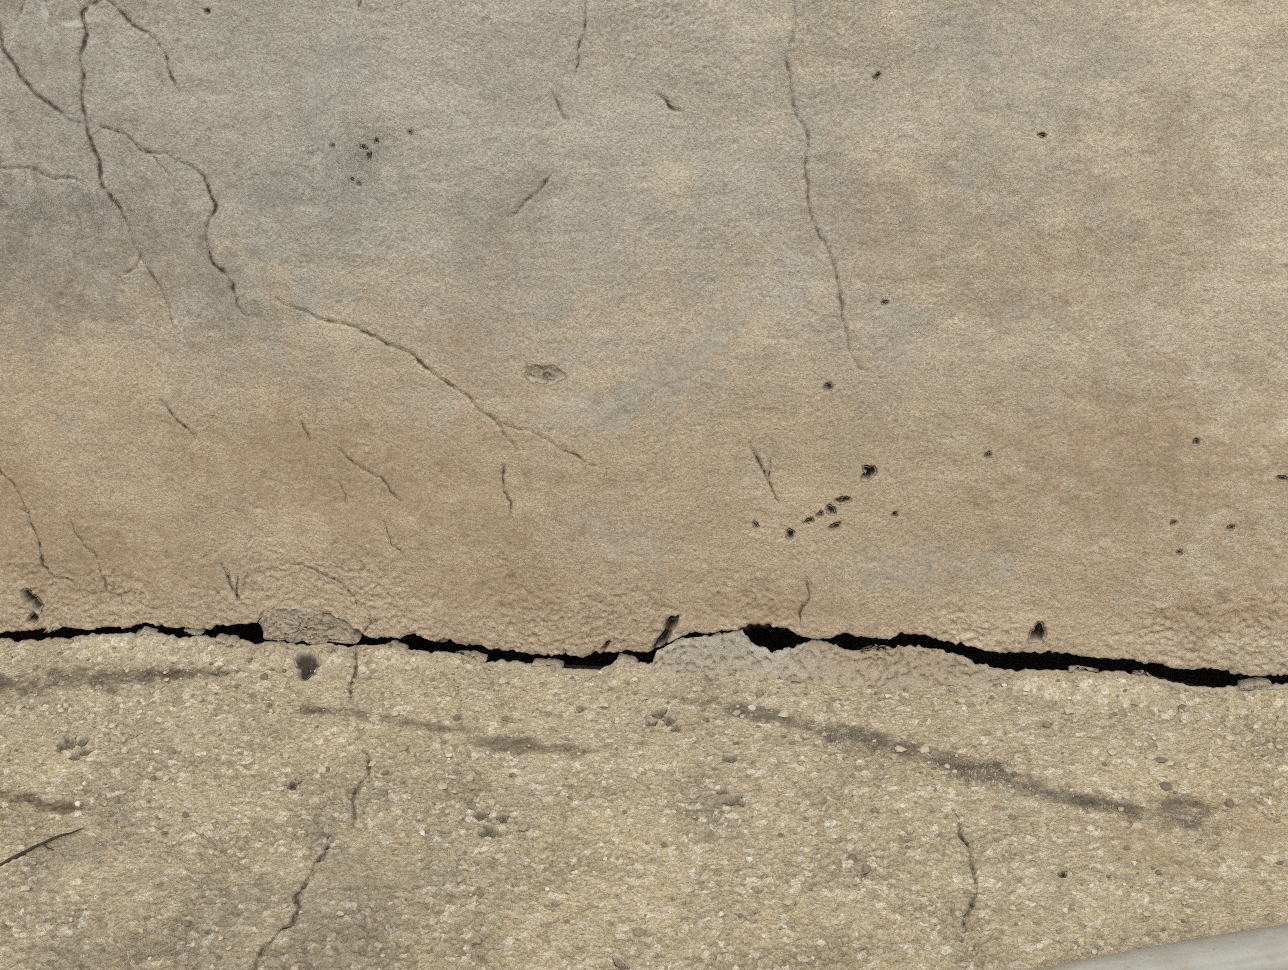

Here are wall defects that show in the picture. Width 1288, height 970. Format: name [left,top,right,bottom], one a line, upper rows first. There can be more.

crack [0,0,240,328]
crack [339,455,400,550]
crack [300,309,593,509]
crack [0,470,1288,701]
crack [754,452,779,502]
crack [251,753,370,970]